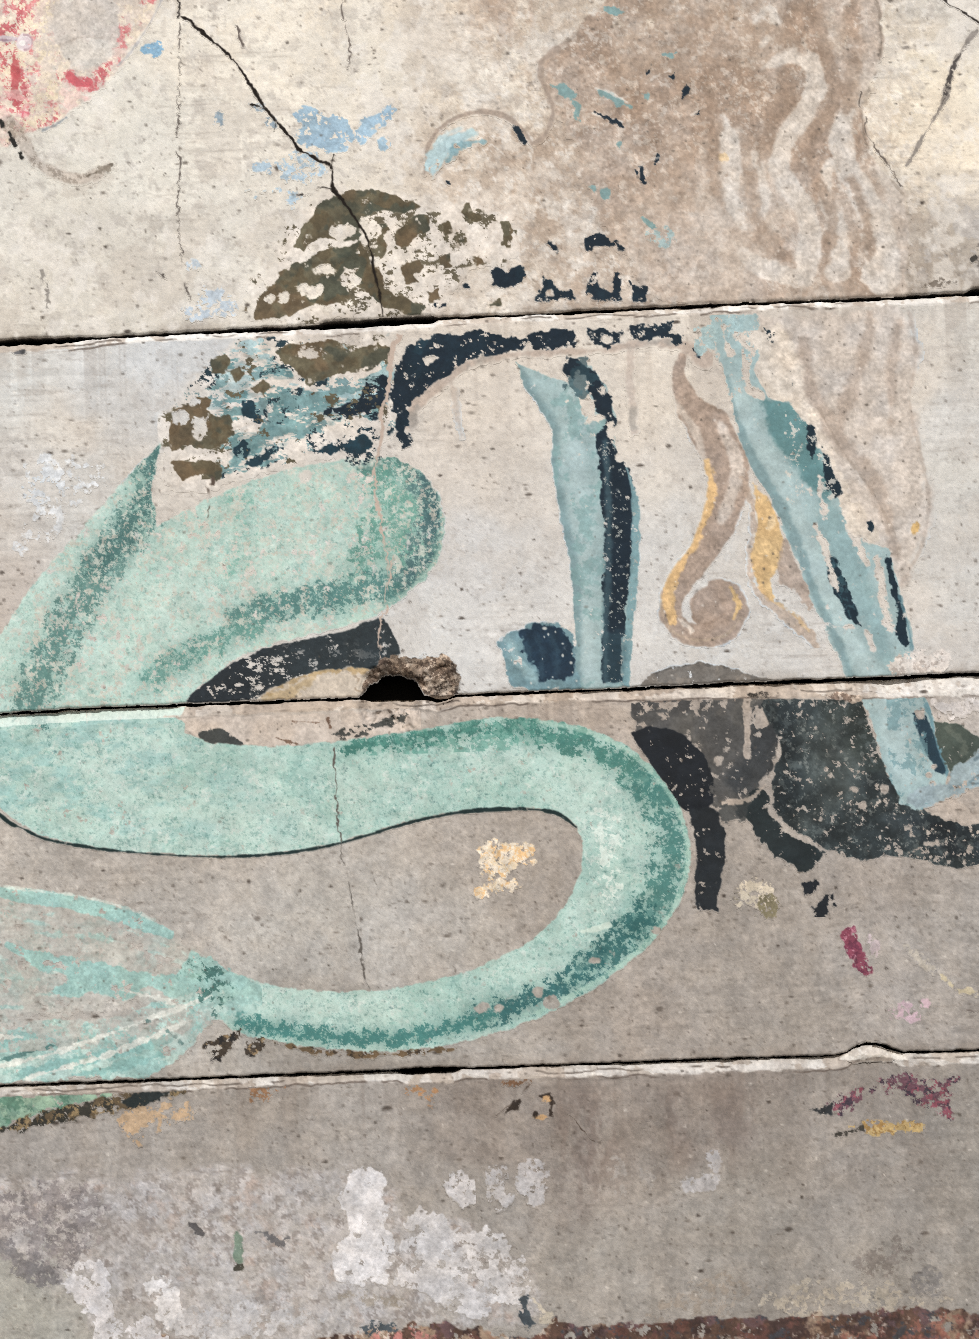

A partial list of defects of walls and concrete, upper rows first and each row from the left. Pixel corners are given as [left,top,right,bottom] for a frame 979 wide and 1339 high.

crack [941,0,979,24]
crack [857,90,904,188]
crack [174,0,404,659]
spalling [360,652,462,703]